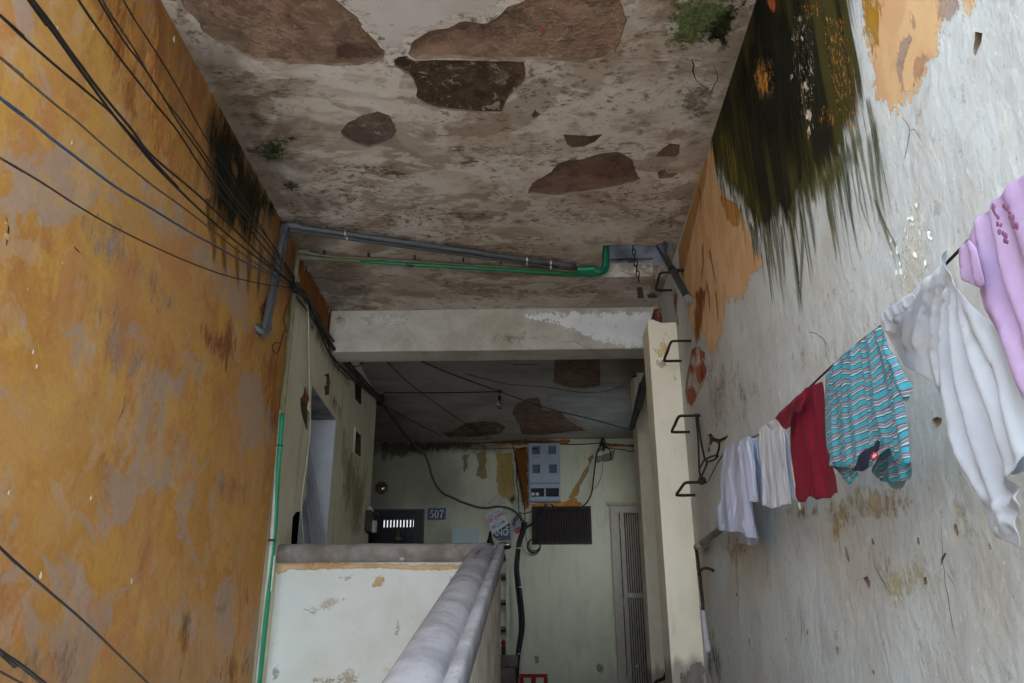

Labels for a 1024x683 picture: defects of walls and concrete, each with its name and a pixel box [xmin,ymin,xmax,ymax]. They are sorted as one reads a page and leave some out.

spalling [181,0,627,113]
spalling [341,111,397,148]
spalling [528,134,640,195]
flaking render [440,359,632,438]